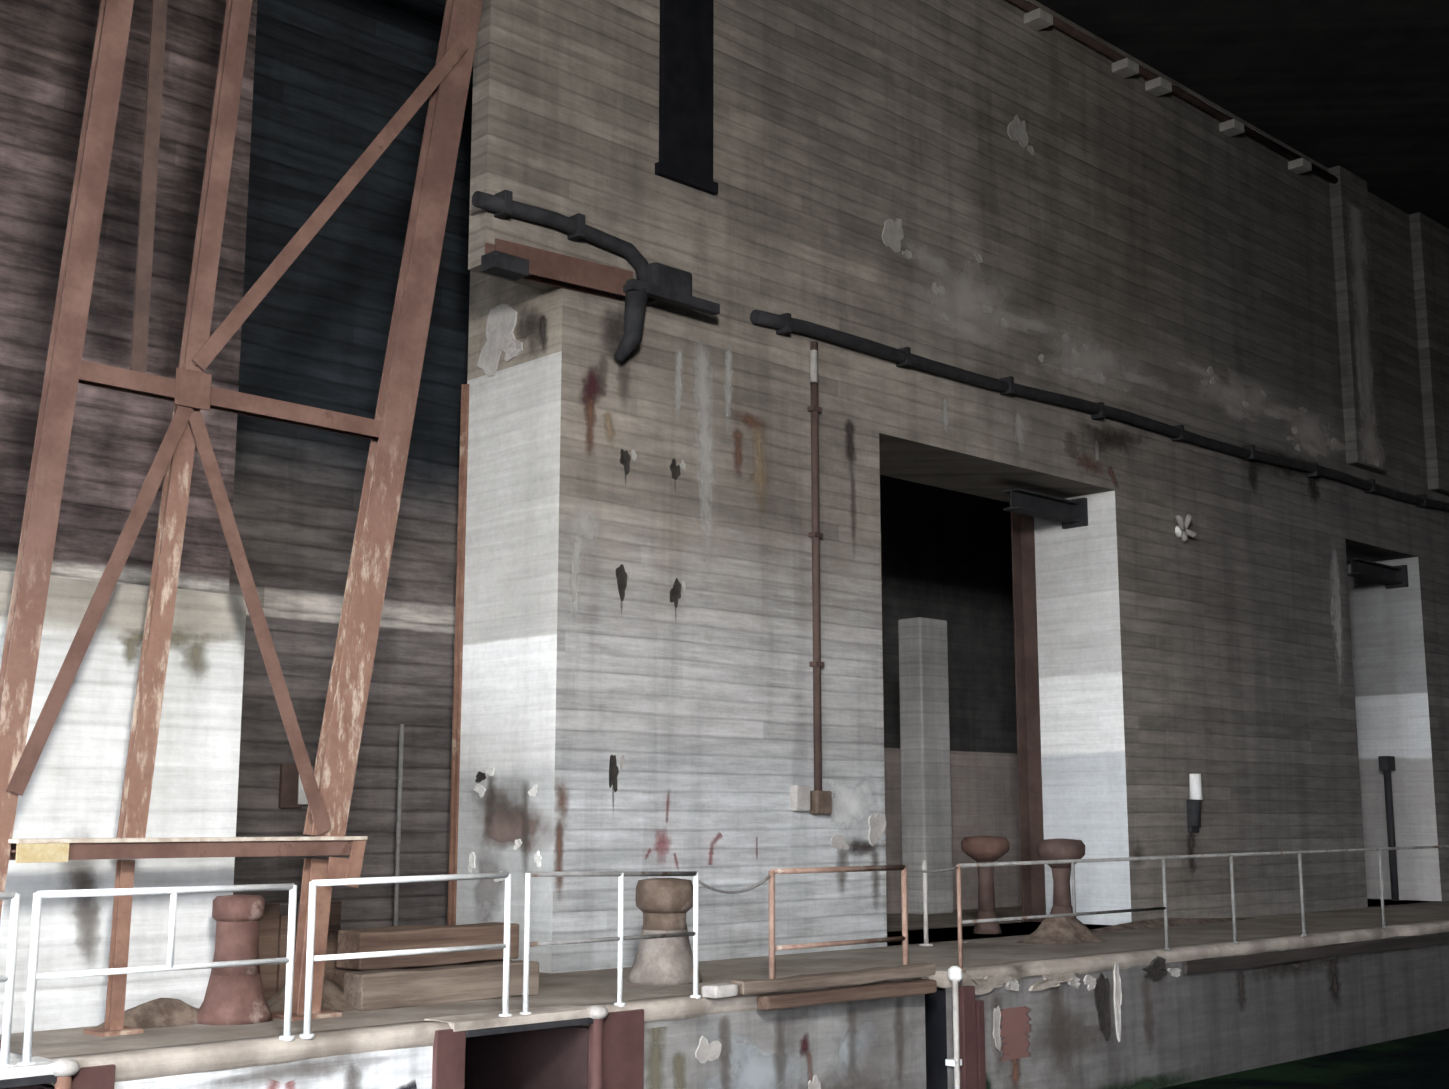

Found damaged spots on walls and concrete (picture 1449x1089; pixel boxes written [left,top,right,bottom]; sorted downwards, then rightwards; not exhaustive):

peeling [477,303,523,377]
peeling [882,218,1166,390]
corrosion [583,371,613,451]
damp [698,354,711,510]
corrosion [734,414,763,494]
peeling [1178,362,1345,456]
damp [1262,958,1340,999]
peeling [695,1036,787,1089]
peeling [808,1075,821,1089]